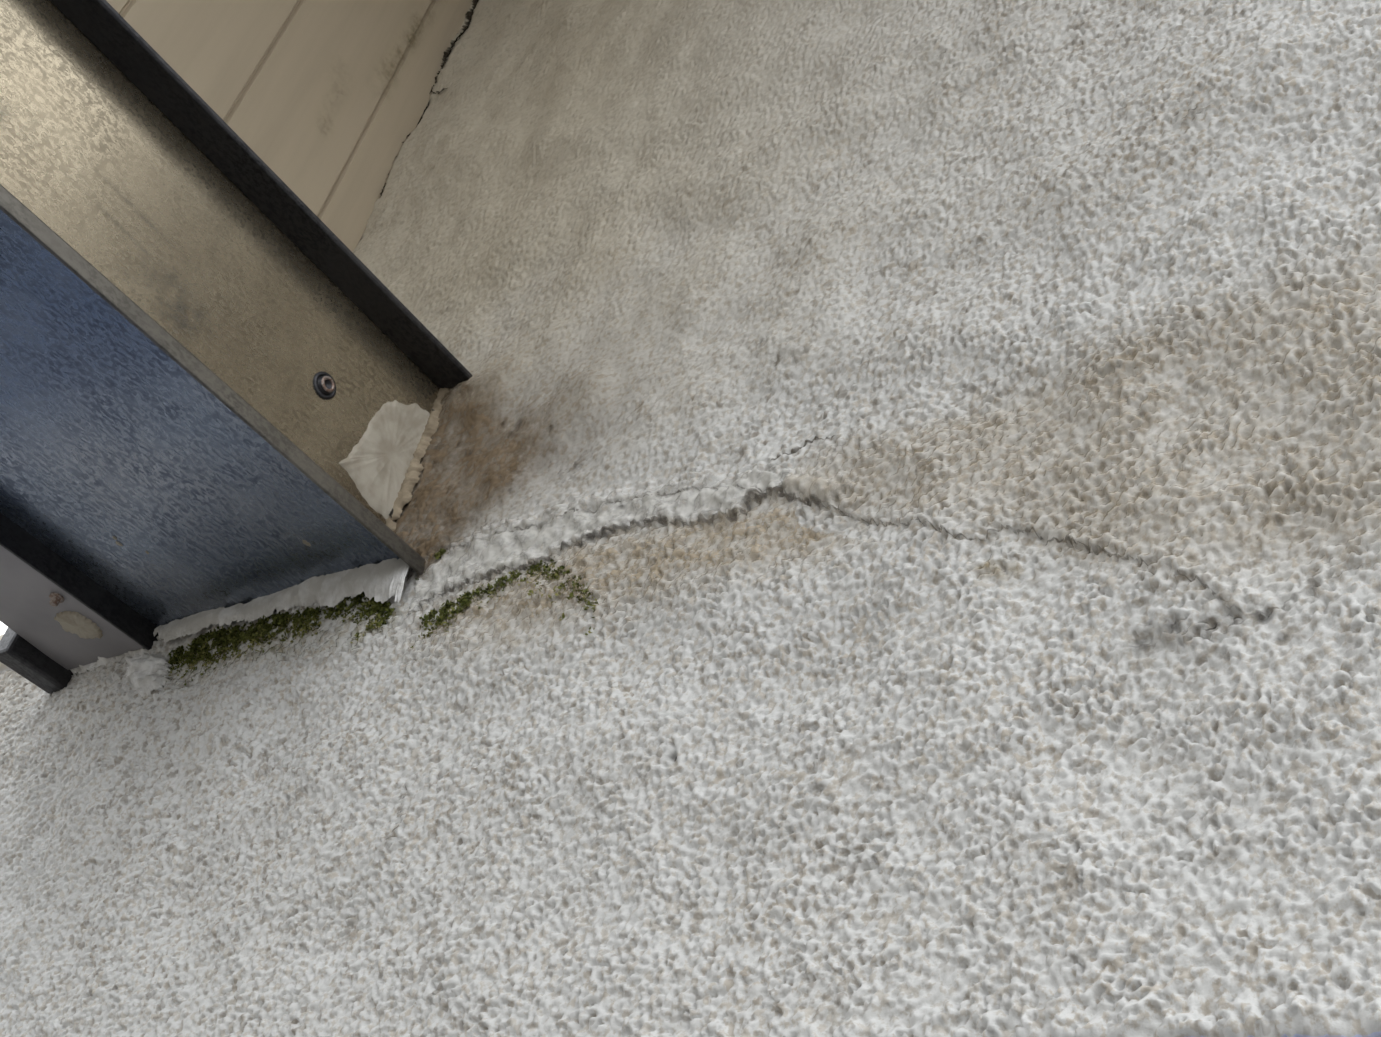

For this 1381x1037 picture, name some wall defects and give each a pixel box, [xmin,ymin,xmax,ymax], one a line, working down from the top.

crack [380,0,478,197]
crack [447,435,835,550]
crack [827,505,1155,566]